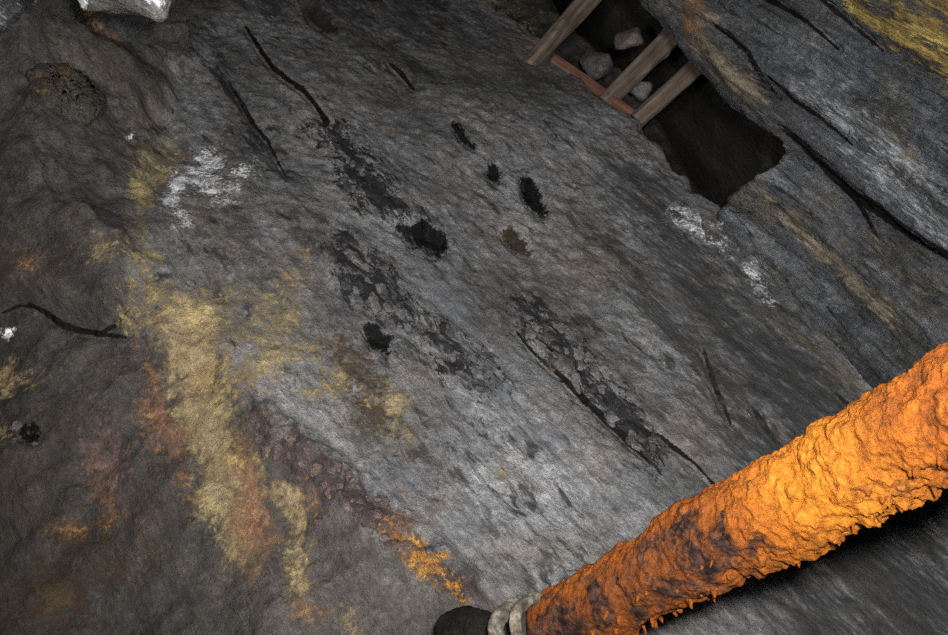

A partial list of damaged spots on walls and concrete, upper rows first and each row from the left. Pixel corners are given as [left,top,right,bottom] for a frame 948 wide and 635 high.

crack [228,82,286,176]
crack [245,26,330,126]
crack [389,63,415,91]
crack [2,302,130,339]
rust [315,335,399,439]
crack [516,331,715,485]
rust [227,421,280,581]
rust [378,490,470,605]
rust [525,343,948,635]